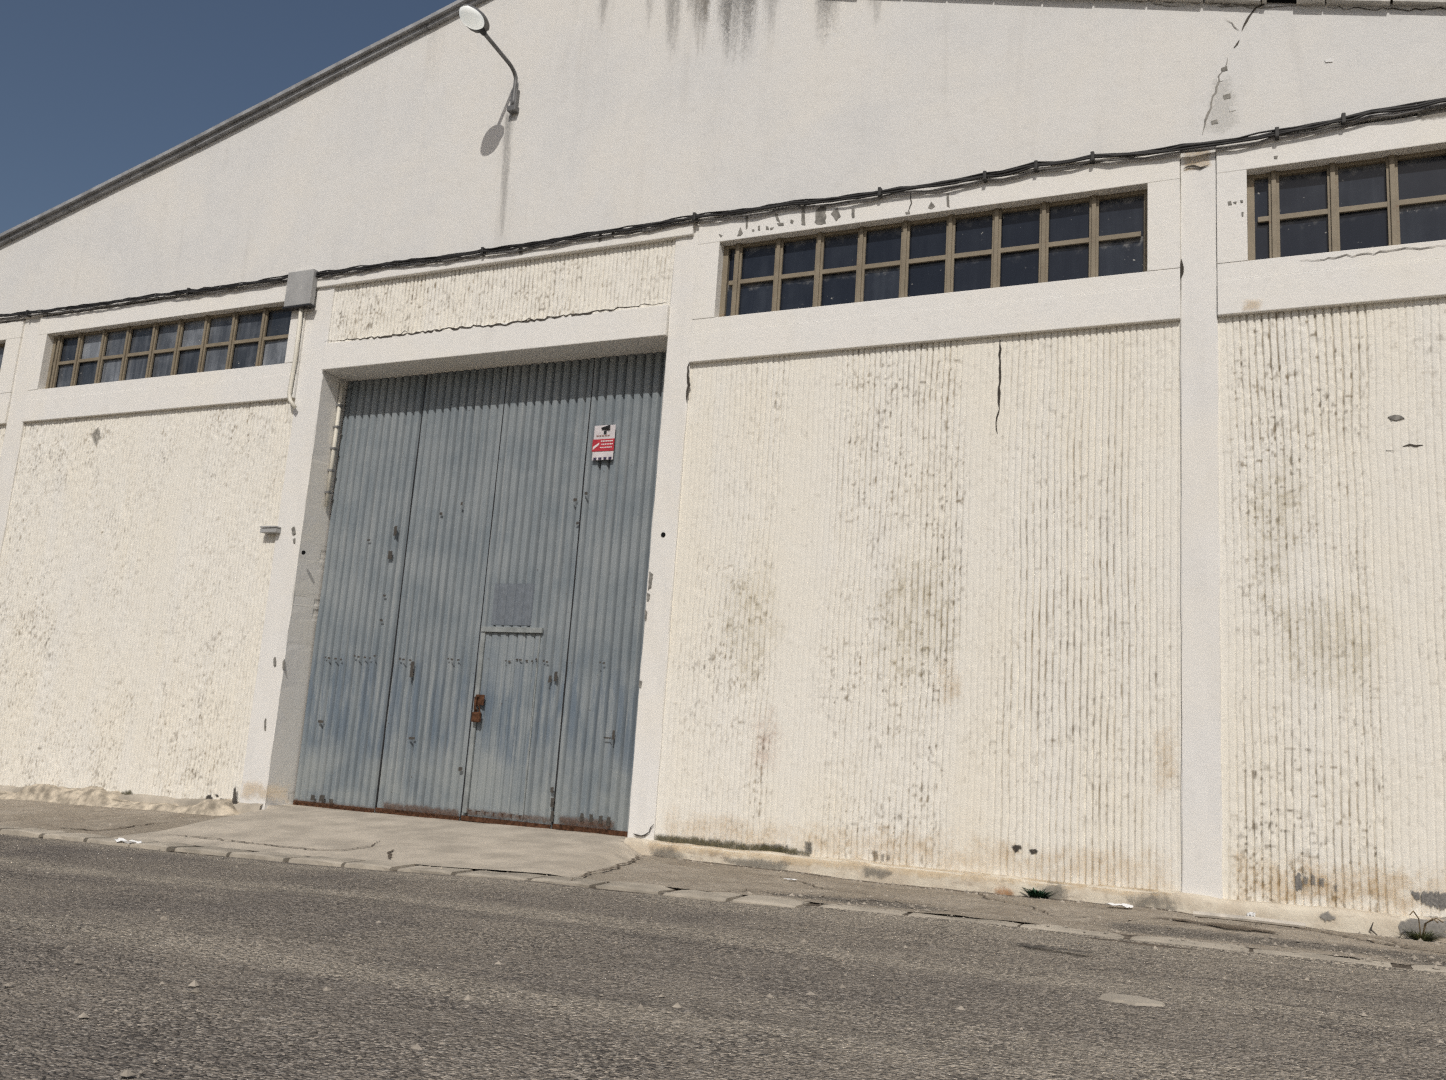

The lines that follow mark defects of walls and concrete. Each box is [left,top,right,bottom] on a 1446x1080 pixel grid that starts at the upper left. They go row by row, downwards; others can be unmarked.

crack [1115,0,1445,135]
crack [995,342,1003,434]
water stain [655,835,812,859]